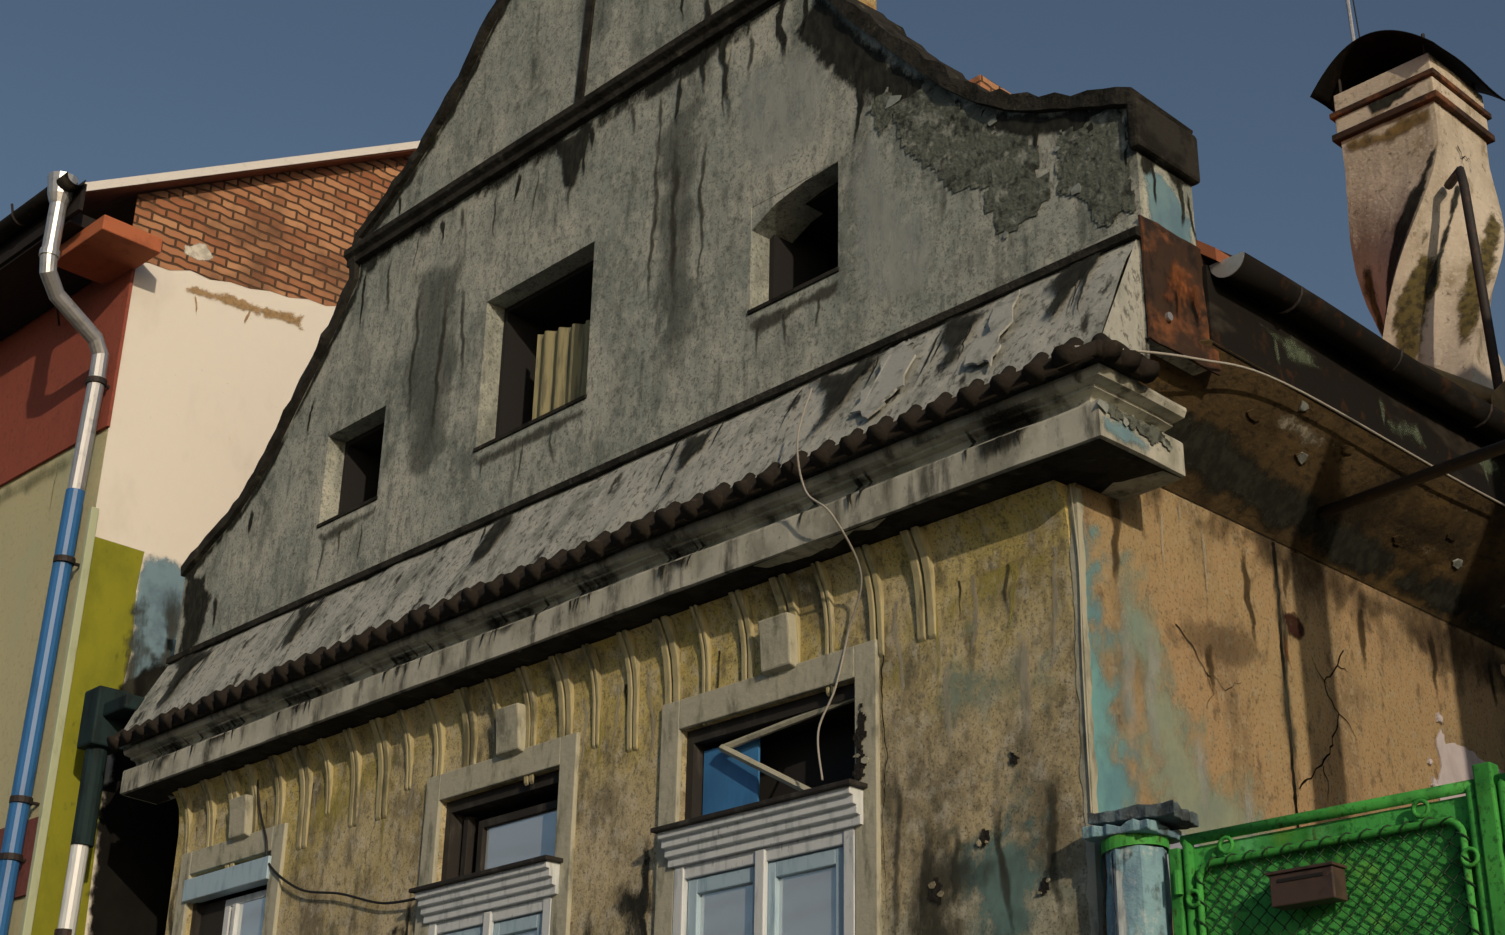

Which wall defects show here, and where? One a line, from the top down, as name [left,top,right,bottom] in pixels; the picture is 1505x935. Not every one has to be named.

water stain [476,0,925,232]
spalling [867,77,1136,239]
water stain [981,109,1197,242]
water stain [964,403,1040,460]
peeling [1097,399,1129,427]
water stain [124,438,286,706]
water stain [1084,498,1272,878]
crack [1176,624,1242,705]
water stain [1242,532,1375,756]
crack [1274,543,1356,828]
peeling [1427,712,1503,801]
water stain [894,791,1059,935]